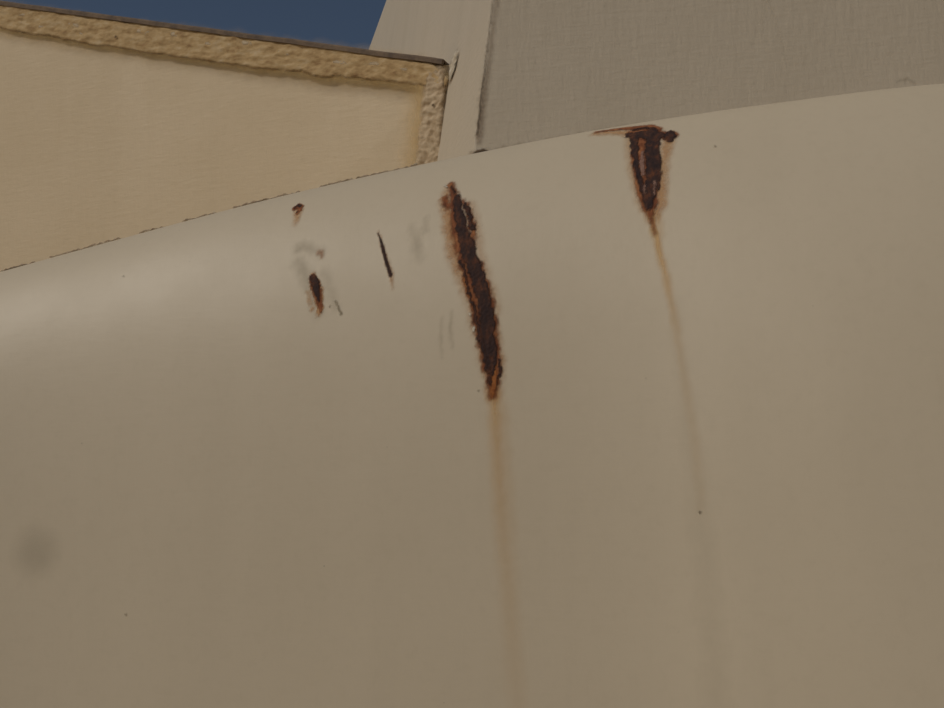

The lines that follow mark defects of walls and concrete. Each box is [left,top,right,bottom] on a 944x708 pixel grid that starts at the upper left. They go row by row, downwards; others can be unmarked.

corrosion [595,125,678,265]
corrosion [309,274,323,315]
corrosion [442,182,502,400]